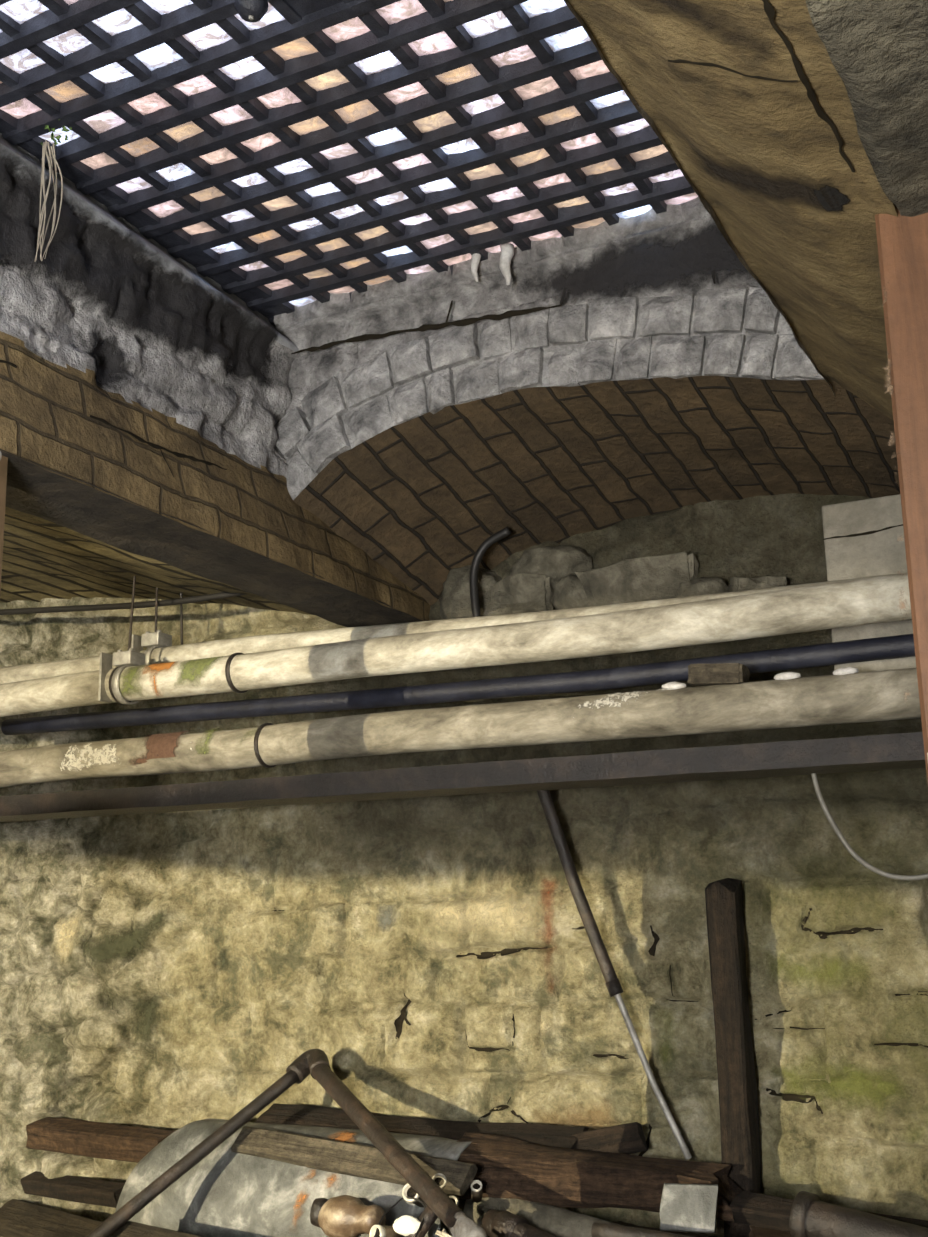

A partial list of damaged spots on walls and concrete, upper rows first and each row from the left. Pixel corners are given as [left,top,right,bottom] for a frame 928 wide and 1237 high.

crack [667,0,855,173]
crack [291,300,564,354]
crack [823,524,903,540]
crack [801,908,883,939]
crack [456,926,584,959]
crack [394,993,411,1039]
crack [874,1041,928,1049]